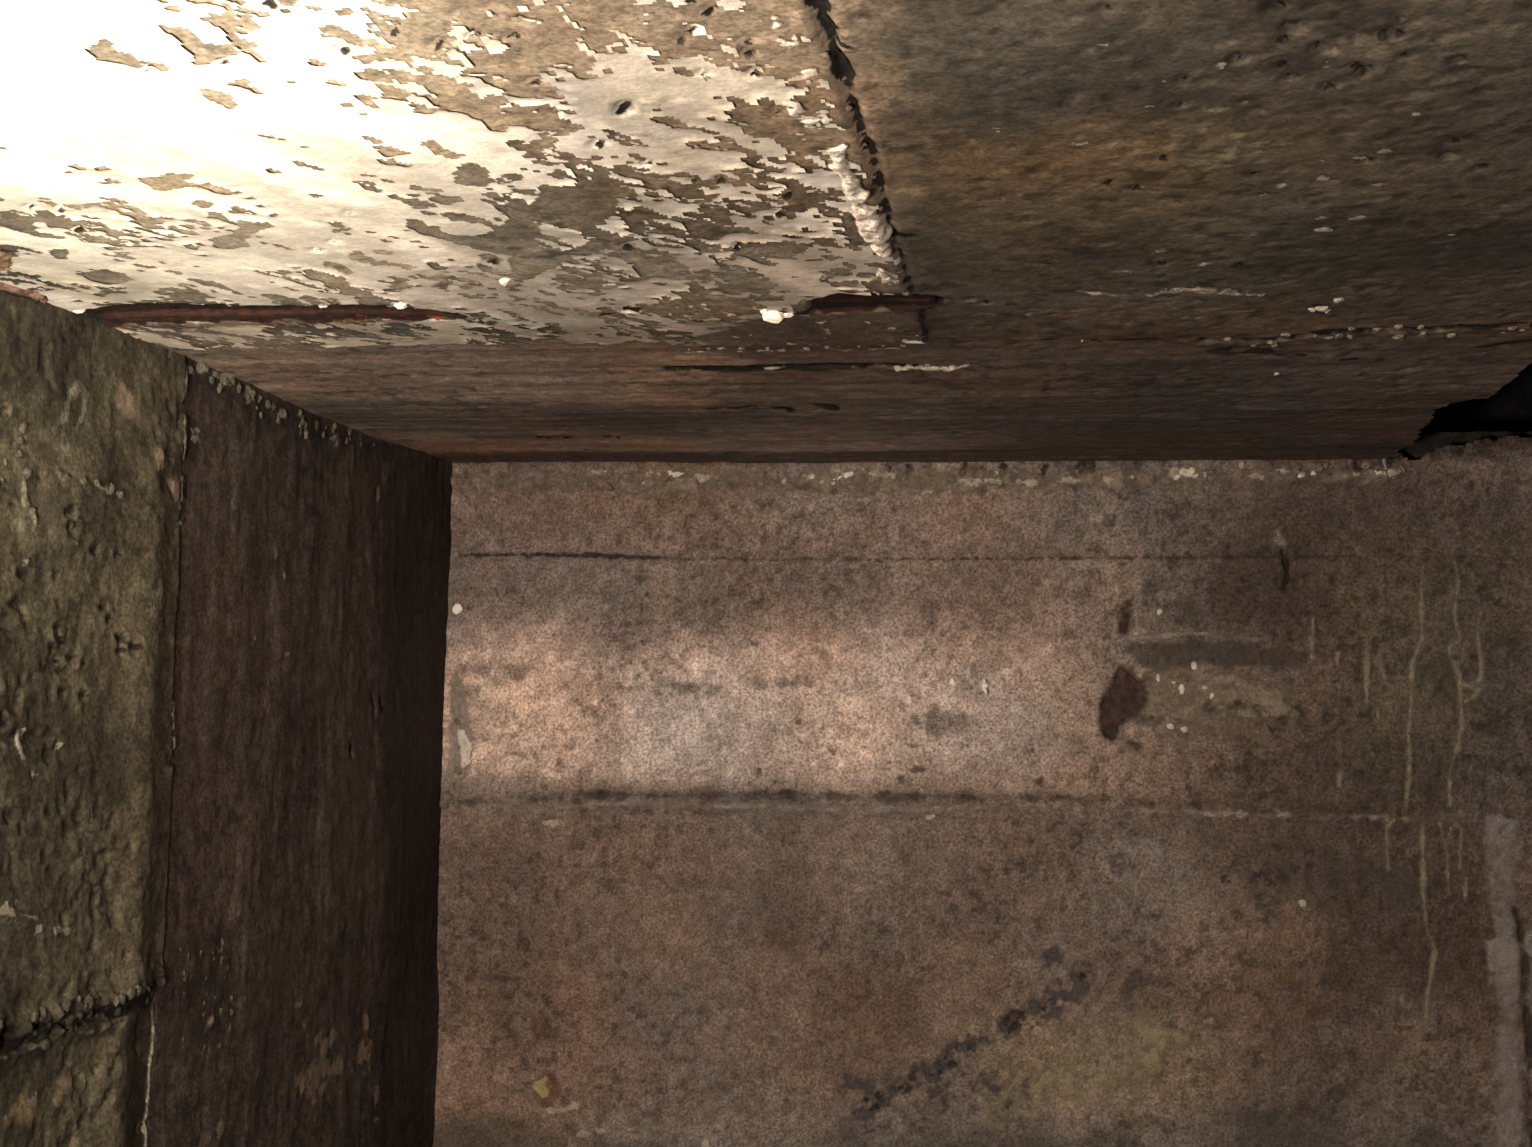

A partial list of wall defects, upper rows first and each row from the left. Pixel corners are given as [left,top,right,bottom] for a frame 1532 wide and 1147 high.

peeling [0,0,928,463]
crack [664,0,969,417]
rust [84,302,466,330]
rust [778,292,944,337]
crack [1039,336,1155,344]
water stain [1364,562,1484,1030]
crack [0,984,150,1060]